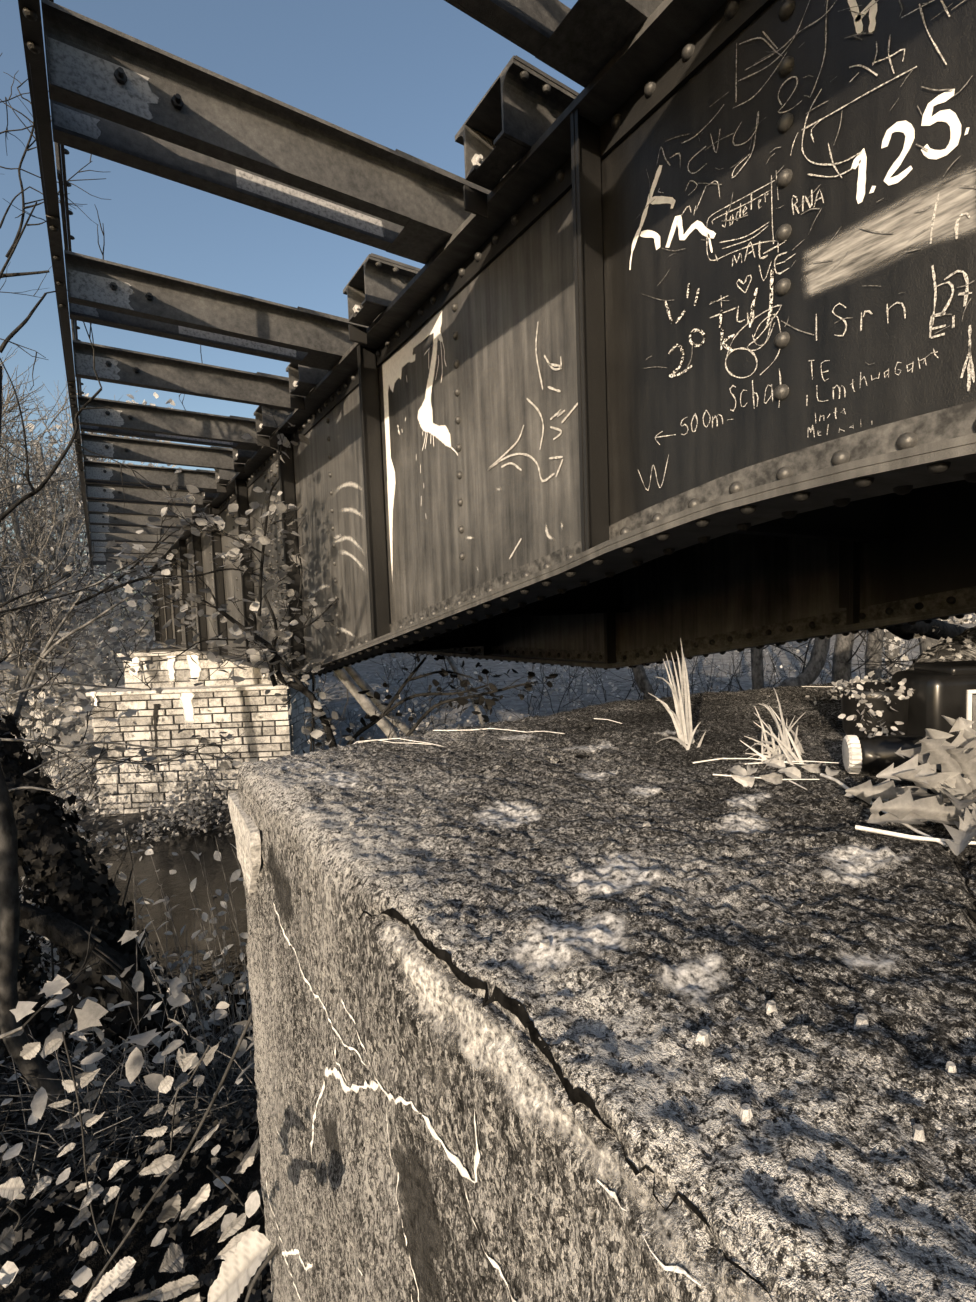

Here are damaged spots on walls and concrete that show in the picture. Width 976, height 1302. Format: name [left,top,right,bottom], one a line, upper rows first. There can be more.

crack [358,908,774,1302]